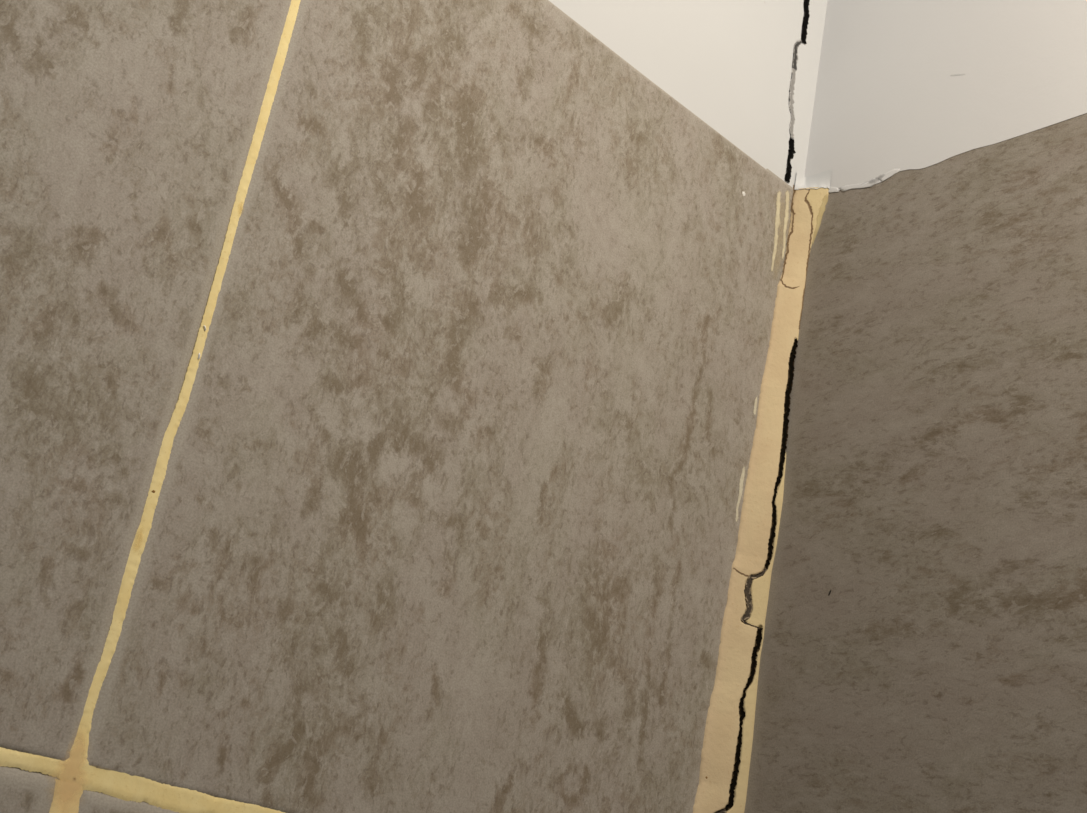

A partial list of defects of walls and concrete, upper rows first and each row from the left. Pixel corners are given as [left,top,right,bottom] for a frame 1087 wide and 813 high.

crack [715,0,813,813]